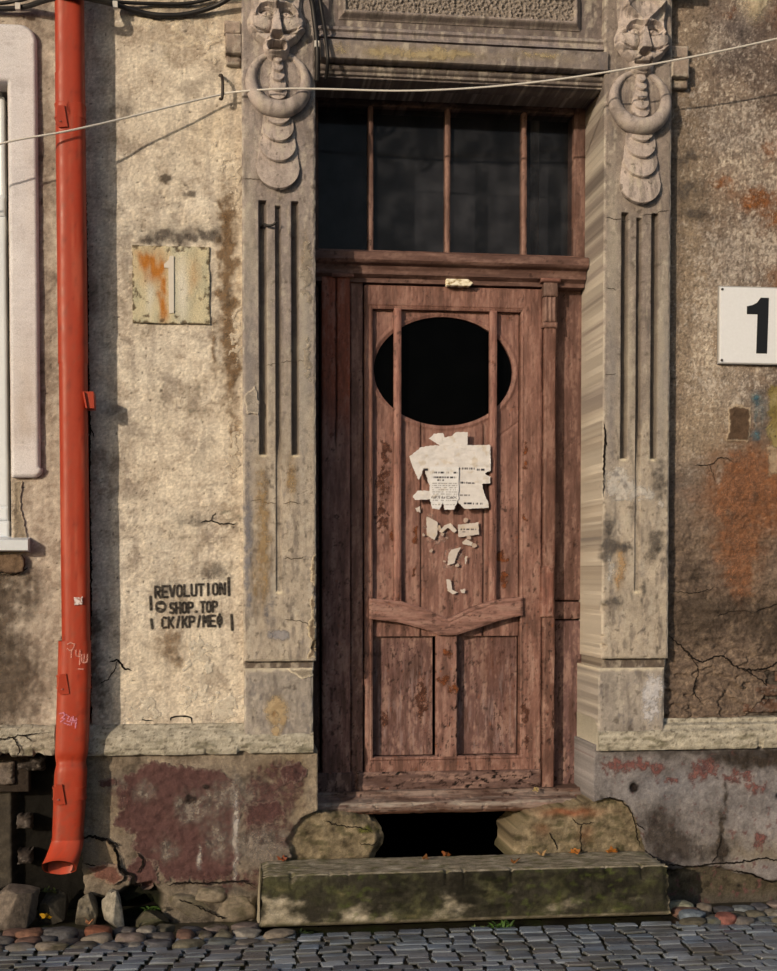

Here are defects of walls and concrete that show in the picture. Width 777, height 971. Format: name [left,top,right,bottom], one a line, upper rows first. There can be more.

leakage [141,197,241,390]
crack [86,196,94,640]
crack [90,659,132,720]
crack [668,635,777,706]
flaking render [742,670,777,716]
flaking render [0,753,46,792]
flaking render [16,812,34,829]
flaking render [17,846,34,864]
crack [83,835,144,895]
peeling [88,760,308,893]
crack [602,797,777,883]
crack [169,880,257,919]